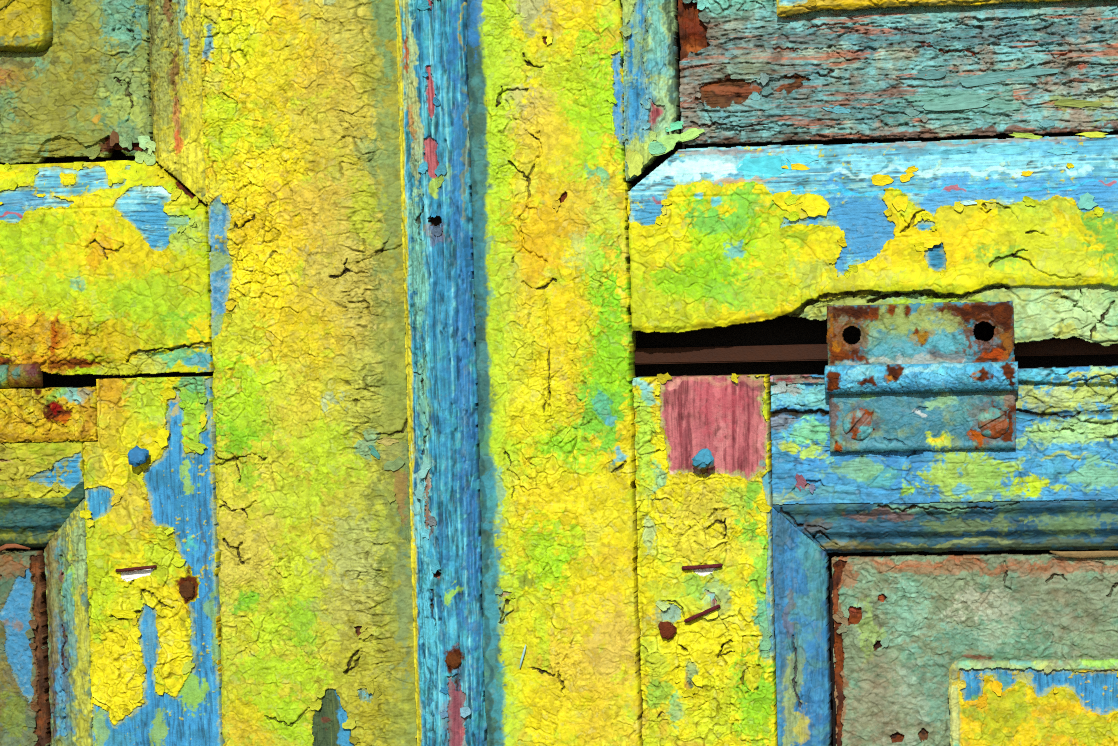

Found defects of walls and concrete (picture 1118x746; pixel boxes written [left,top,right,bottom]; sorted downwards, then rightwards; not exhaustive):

peeling [0,130,236,340]
crack [328,259,353,279]
peeling [628,119,1118,278]
corrosion [825,304,930,432]
corrosion [931,301,1018,388]
crack [375,418,430,455]
corrosion [966,398,1016,449]
crack [214,455,266,565]
peeling [91,377,225,746]
crack [343,650,360,675]
corrosion [443,641,466,691]
peeling [952,665,1118,715]